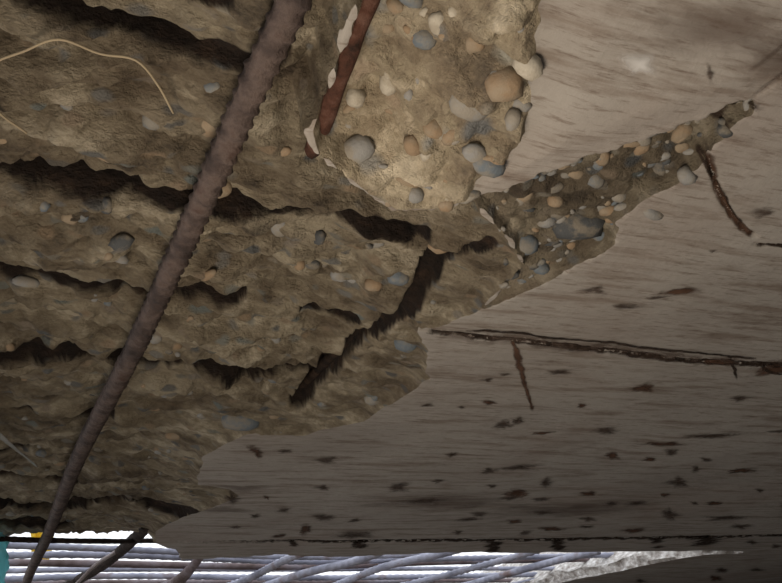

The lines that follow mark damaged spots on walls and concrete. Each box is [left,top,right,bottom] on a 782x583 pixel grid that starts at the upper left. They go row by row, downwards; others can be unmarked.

spalling [477,99,754,309]
crack [696,145,782,248]
spalling [0,0,614,583]
rust [511,337,534,410]
crack [431,329,782,378]
spalling [647,442,677,456]
crack [229,534,782,552]
spalling [512,550,742,583]